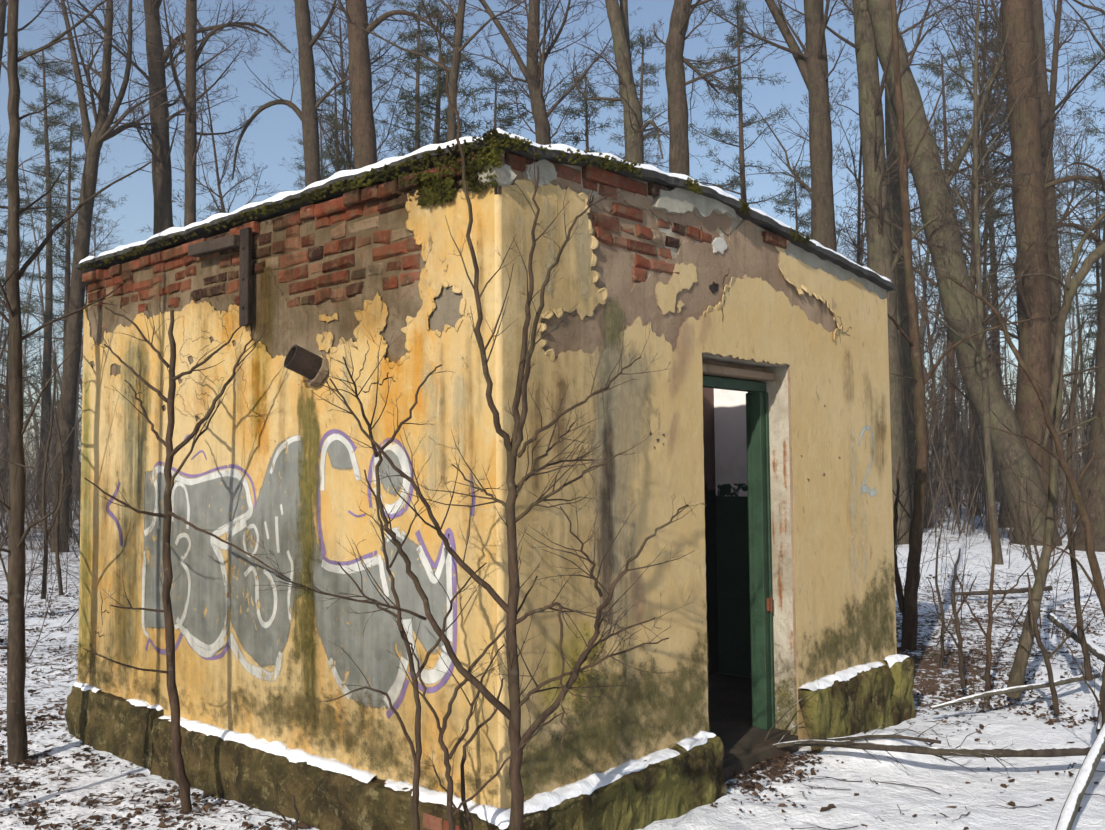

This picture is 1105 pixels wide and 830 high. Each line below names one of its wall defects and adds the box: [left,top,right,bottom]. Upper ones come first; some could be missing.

flaking render [86,176,492,369]
flaking render [538,177,886,362]
damp [293,385,321,717]
flaking render [420,812,463,830]